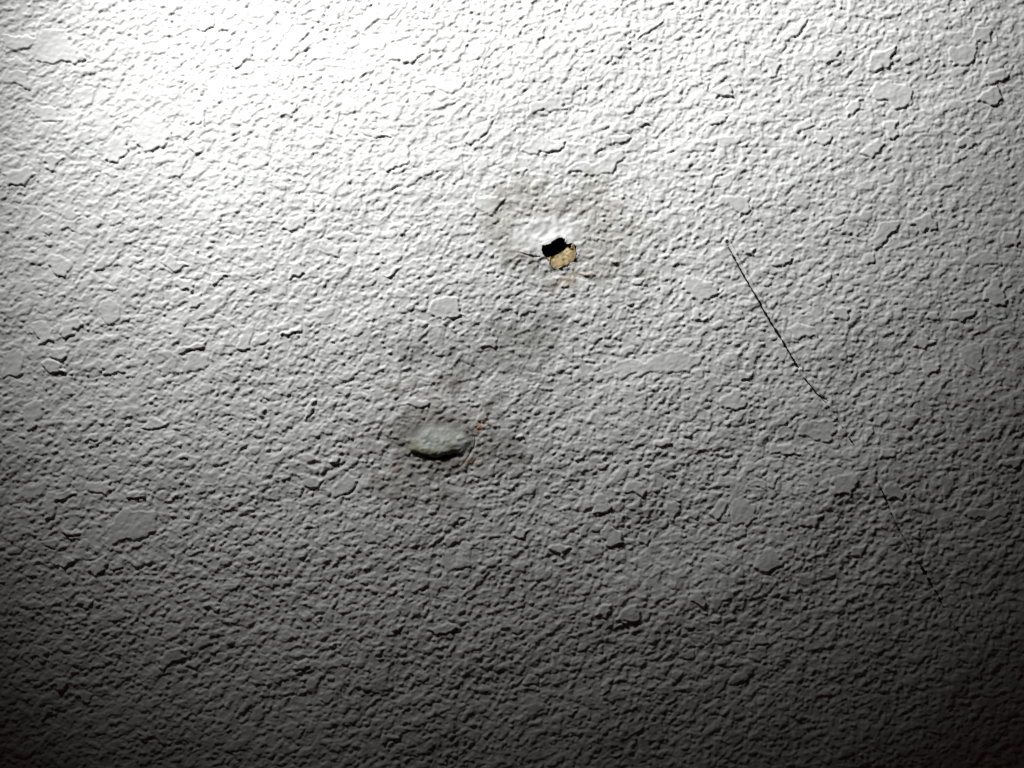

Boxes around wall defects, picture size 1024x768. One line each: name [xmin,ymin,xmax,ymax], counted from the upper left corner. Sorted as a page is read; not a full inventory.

spalling [546,244,577,270]
crack [727,244,854,444]
crack [877,482,971,651]